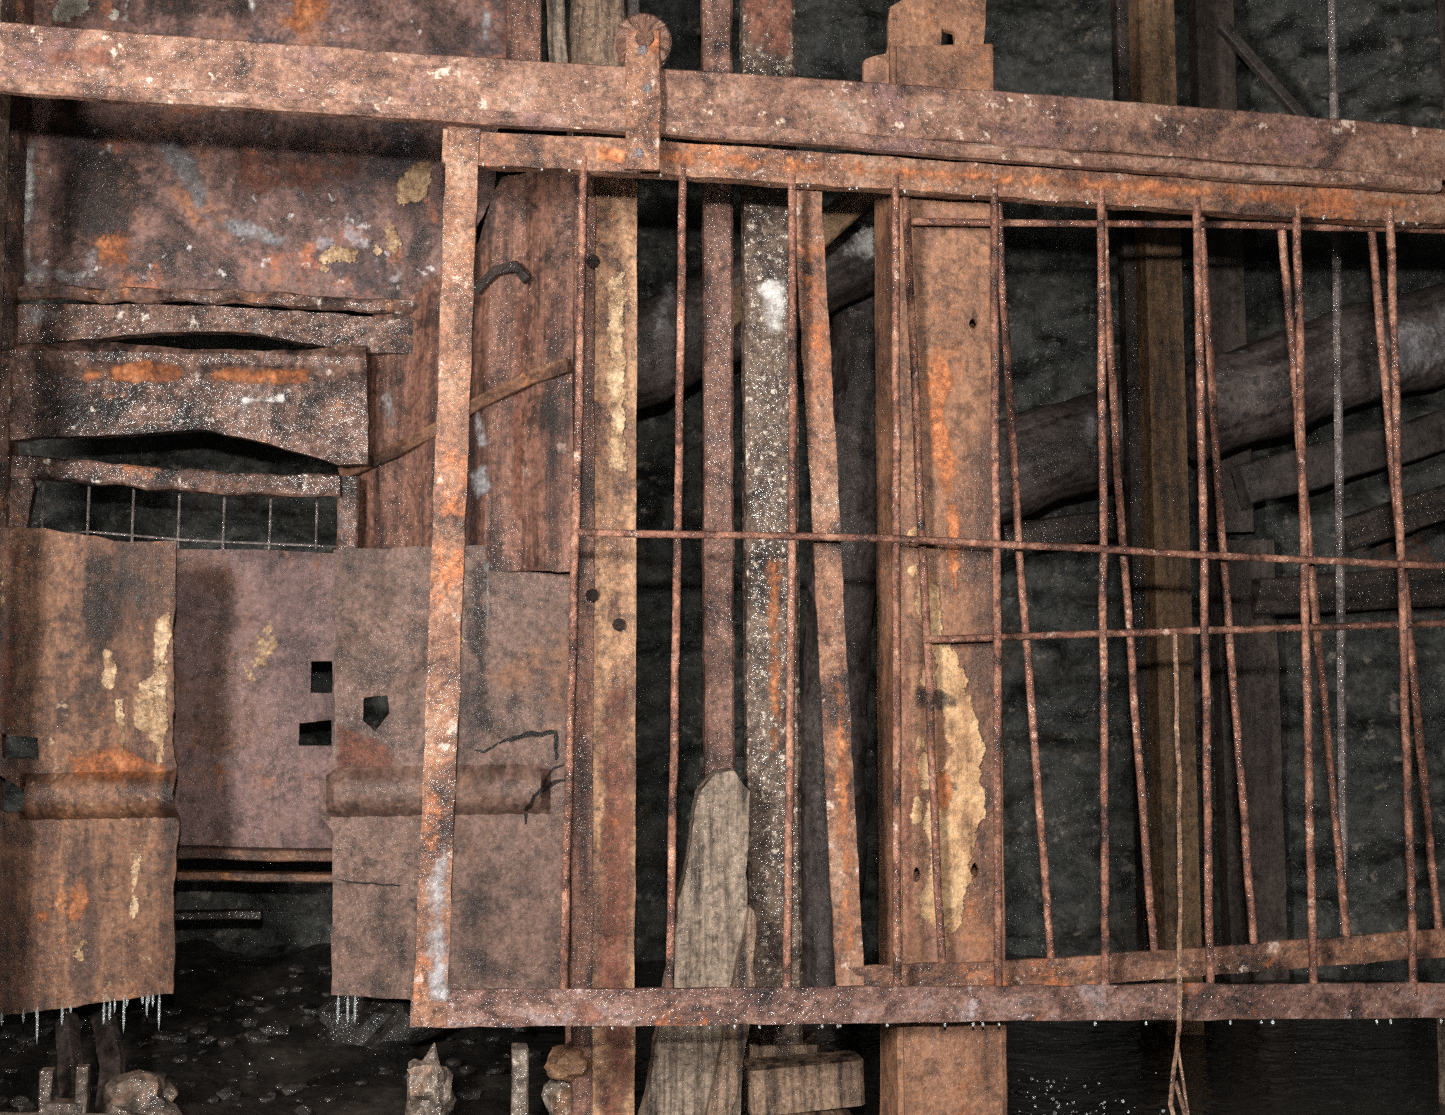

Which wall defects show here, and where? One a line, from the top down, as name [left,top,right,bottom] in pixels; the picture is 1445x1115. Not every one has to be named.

water stain [145,0,254,20]
corrosion [597,146,625,163]
corrosion [783,158,1344,203]
corrosion [923,345,960,597]
corrosion [766,562,782,749]
corrosion [71,745,164,781]
corrosion [835,722,852,874]
corrosion [937,770,952,809]
corrosion [599,689,632,988]
corrosion [129,848,142,920]
corrosion [71,939,88,962]
corrosion [582,1002,632,1115]